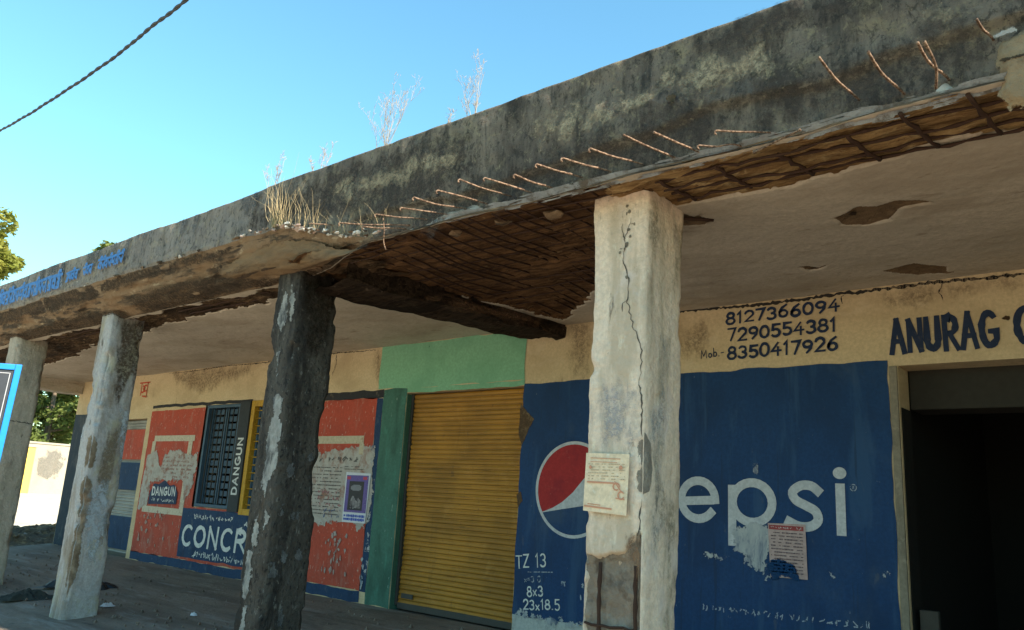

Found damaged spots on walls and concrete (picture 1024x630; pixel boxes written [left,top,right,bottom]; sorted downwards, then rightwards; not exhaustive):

leakage [242,107,725,235]
spalling [232,18,1024,320]
spalling [0,344,9,364]
spalling [31,324,101,365]
spalling [130,284,296,332]
crack [619,205,643,437]
leakage [37,451,65,479]
leakage [98,426,124,503]
spalling [637,433,653,494]
peeling [239,393,303,630]
peeling [359,493,372,590]
peeling [732,522,770,581]